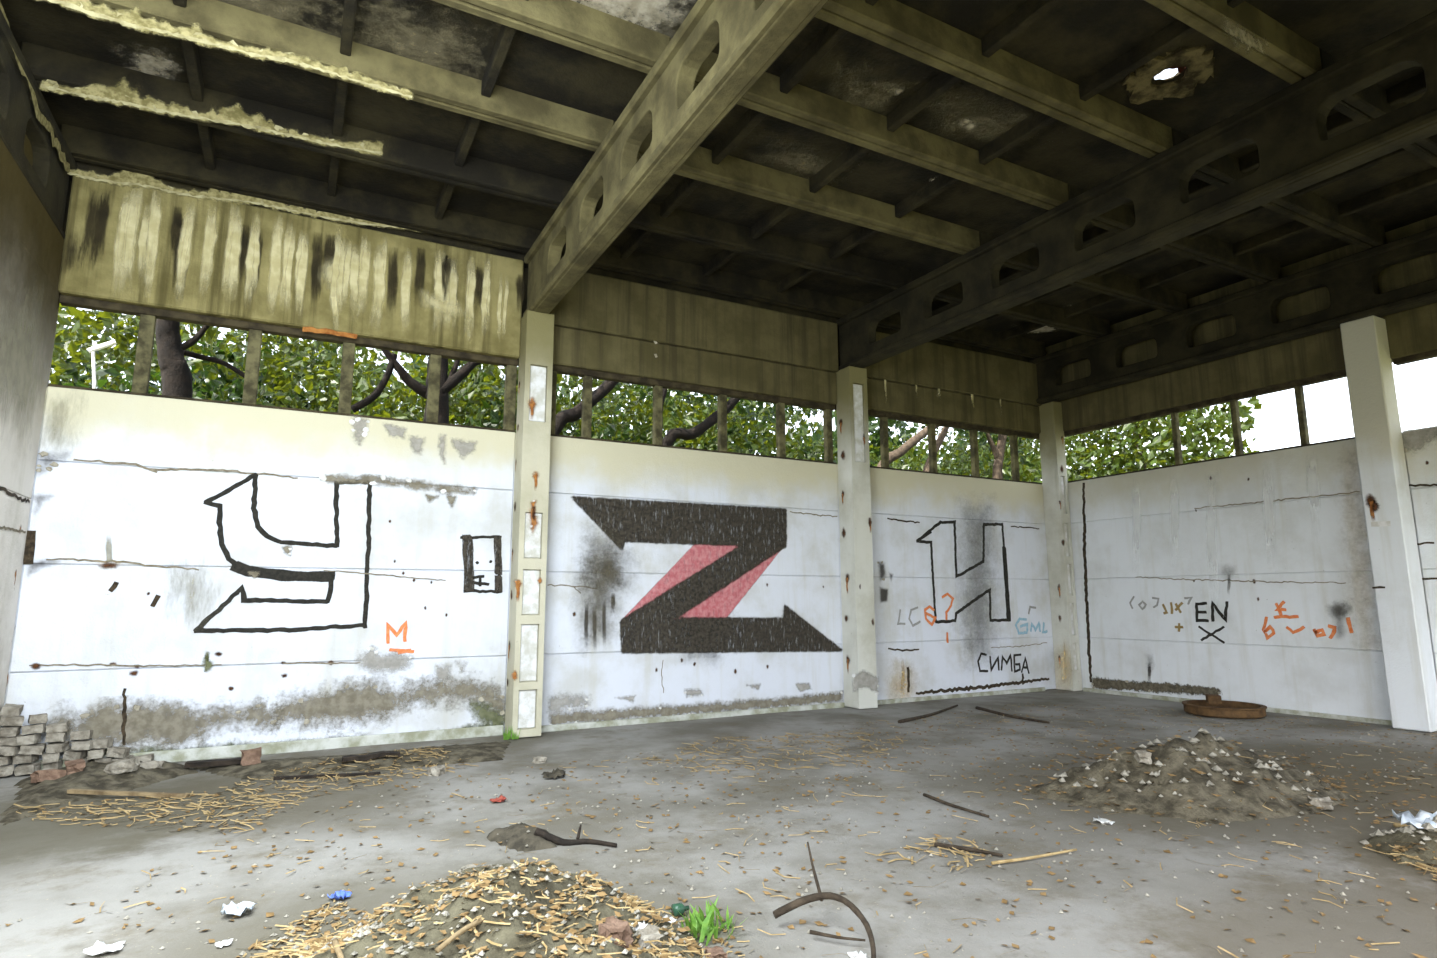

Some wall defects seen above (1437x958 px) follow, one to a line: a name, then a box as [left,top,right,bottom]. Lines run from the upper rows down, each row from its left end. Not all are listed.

damp [48,0,413,100]
damp [339,0,474,68]
damp [572,0,687,30]
damp [11,46,525,327]
crack [0,486,199,571]
peeling [319,473,477,507]
corrosion [1366,494,1379,519]
peeling [0,646,505,783]
damp [462,702,505,728]